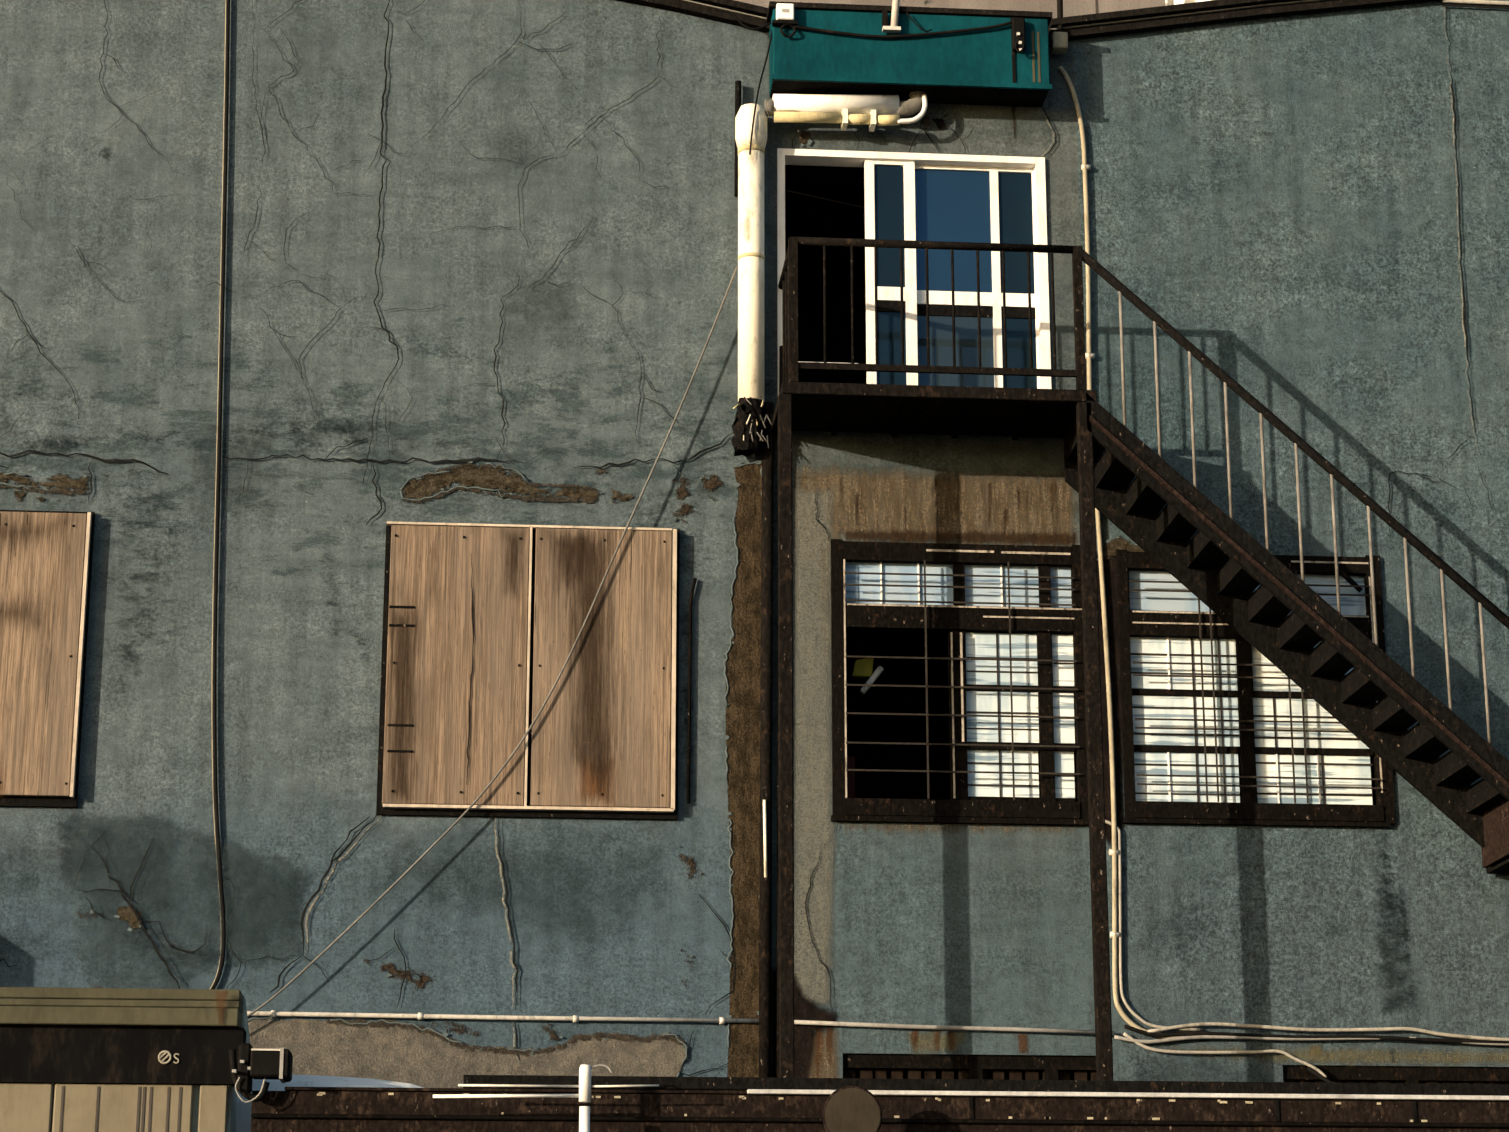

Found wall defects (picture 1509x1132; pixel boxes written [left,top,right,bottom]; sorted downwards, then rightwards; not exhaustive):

crack [99,0,189,255]
crack [71,243,135,302]
crack [206,0,733,525]
crack [1327,6,1494,537]
peeling [0,471,90,505]
crack [0,290,168,503]
peeling [399,461,634,503]
leakage [794,468,1075,1078]
crack [74,815,381,993]
crack [366,929,421,1007]
peeling [248,1016,688,1096]
crack [494,818,521,1061]